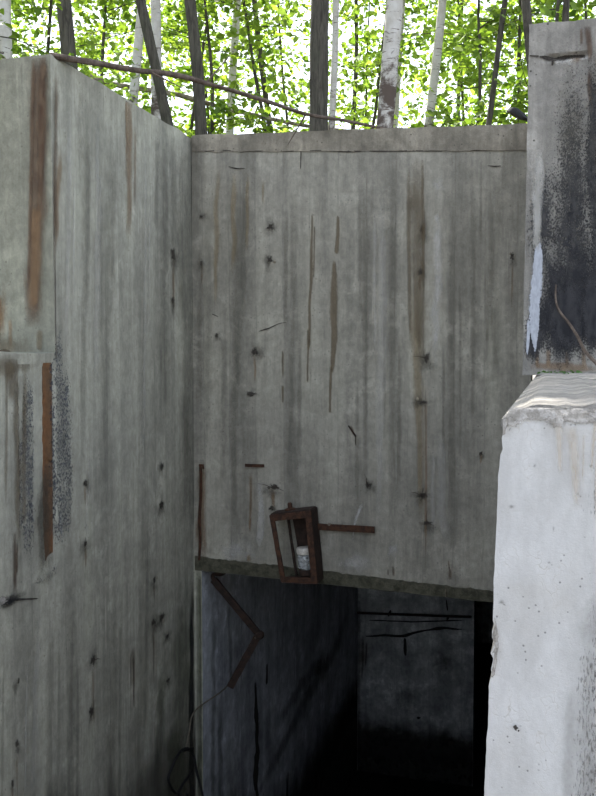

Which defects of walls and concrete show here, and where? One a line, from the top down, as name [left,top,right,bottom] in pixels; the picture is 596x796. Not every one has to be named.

corrosion [27,62,58,316]
spalling [503,407,596,435]
crack [253,664,268,796]